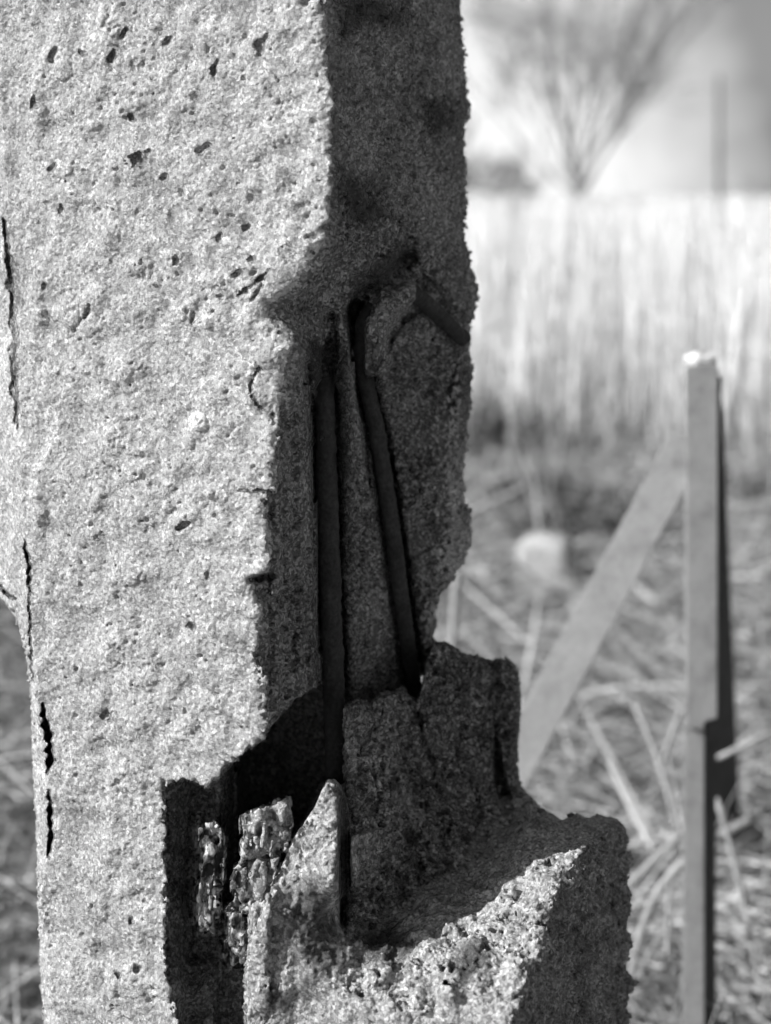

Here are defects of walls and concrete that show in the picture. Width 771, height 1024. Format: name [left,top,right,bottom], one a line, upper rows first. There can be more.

crack [1,217,20,431]
crack [0,538,56,860]
spalling [161,216,620,1024]